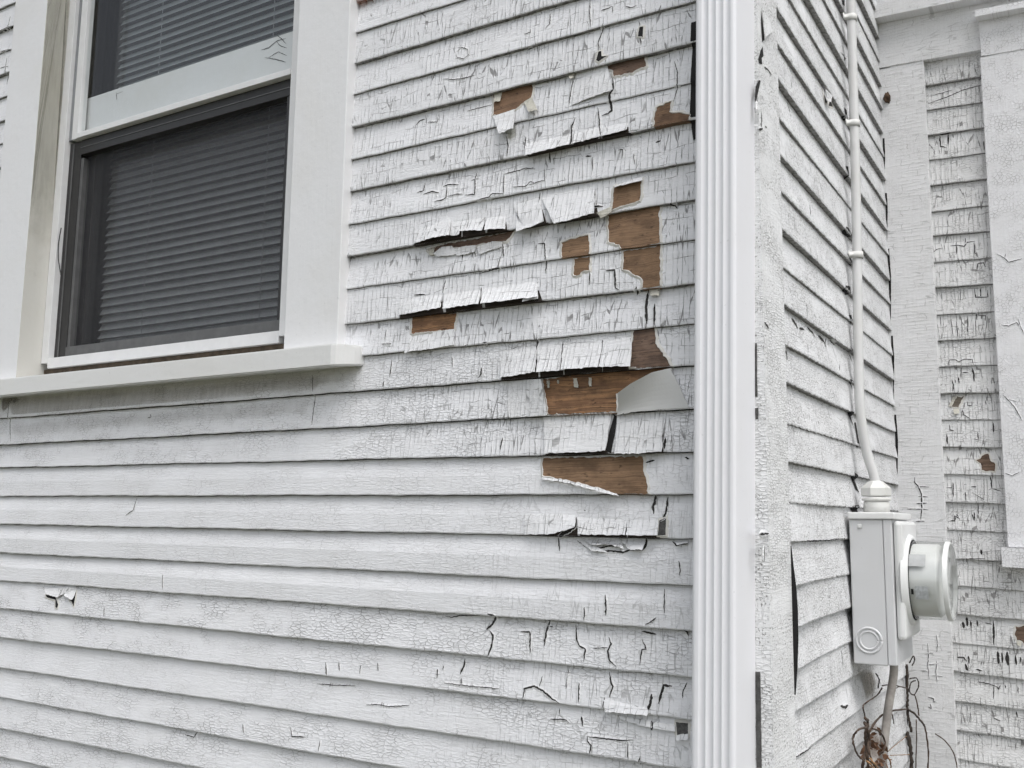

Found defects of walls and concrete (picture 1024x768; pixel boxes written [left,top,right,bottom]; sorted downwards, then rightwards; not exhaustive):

peeling [491,85,537,134]
crack [416,77,661,209]
peeling [568,49,649,105]
peeling [413,176,664,296]
peeling [398,281,546,353]
crack [588,268,658,325]
crack [934,238,1024,444]
peeling [500,328,689,497]
peeling [524,514,689,552]
crack [907,472,1020,523]
crack [435,494,688,765]
crack [921,617,1023,722]